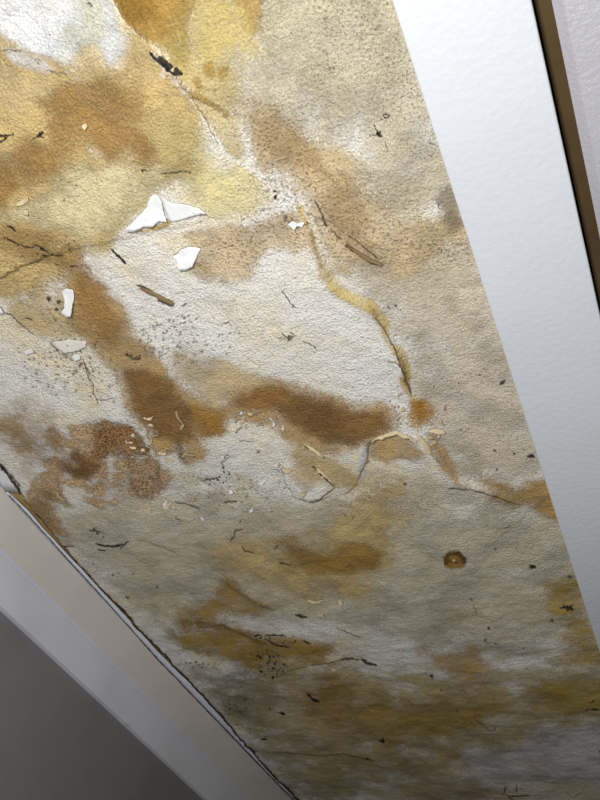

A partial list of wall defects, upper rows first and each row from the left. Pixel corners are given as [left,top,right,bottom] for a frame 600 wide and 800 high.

peeling [125,194,207,233]
peeling [173,247,201,271]
water stain [0,0,541,488]
crack [314,200,378,259]
peeling [0,245,118,402]
crack [369,312,411,395]
peeling [125,390,199,462]
crack [305,439,379,503]
rust [443,551,466,569]
water stain [24,419,600,800]